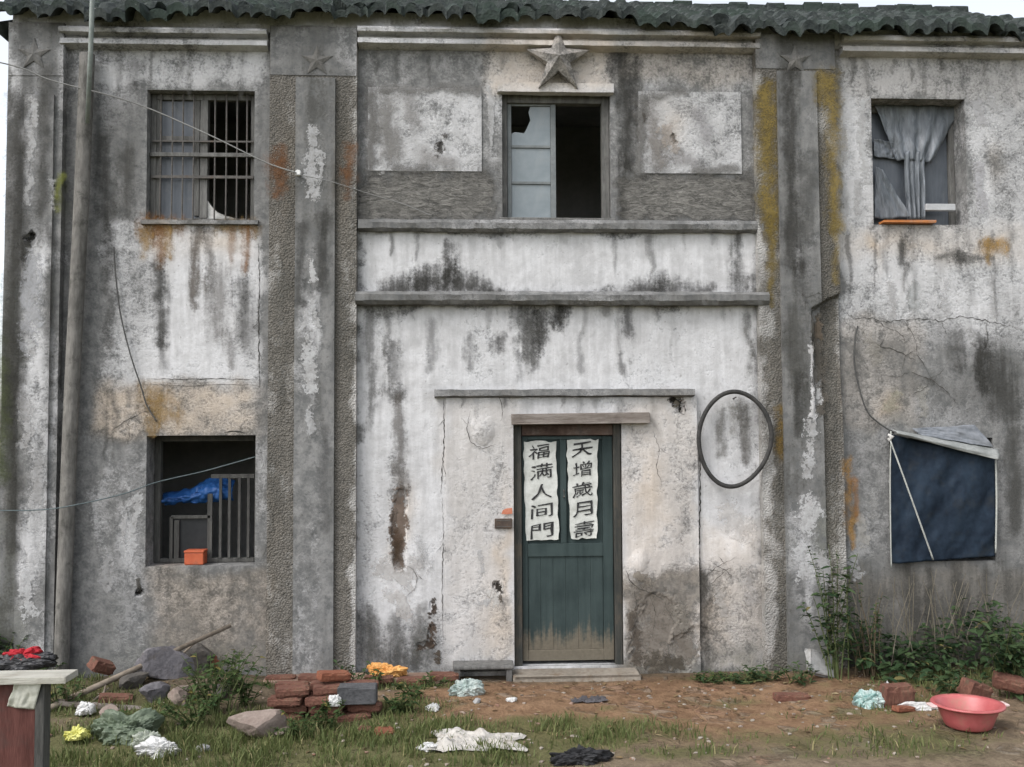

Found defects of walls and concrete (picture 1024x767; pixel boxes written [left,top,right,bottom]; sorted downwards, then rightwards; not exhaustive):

peeling [301,124,326,201]
damp [151,264,166,347]
corrosion [144,225,184,261]
damp [189,225,205,306]
damp [381,240,502,292]
corrosion [982,238,1009,257]
crack [803,293,1015,403]
peeling [789,313,835,586]
spalling [387,472,411,574]
crack [406,400,496,630]
corrosion [842,458,858,549]
spalling [416,597,441,664]